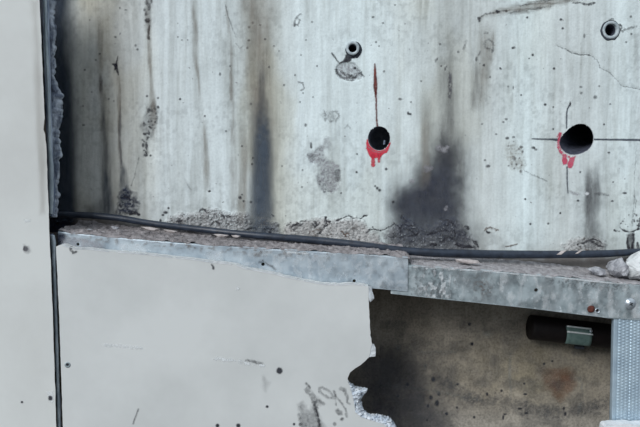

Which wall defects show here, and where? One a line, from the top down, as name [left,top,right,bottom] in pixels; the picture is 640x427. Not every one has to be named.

water stain [39,0,47,150]
water stain [49,0,74,232]
water stain [253,108,272,227]
water stain [394,147,460,239]
spalling [349,382,396,427]